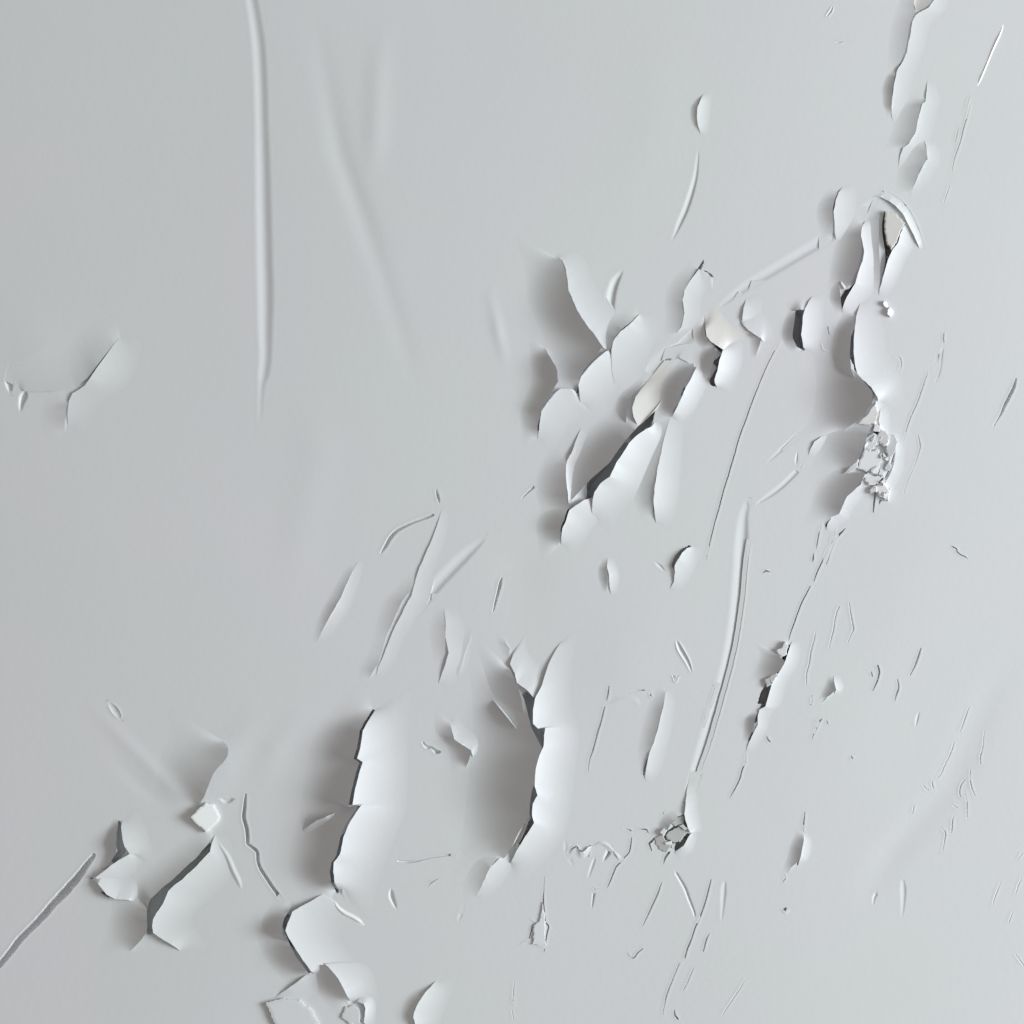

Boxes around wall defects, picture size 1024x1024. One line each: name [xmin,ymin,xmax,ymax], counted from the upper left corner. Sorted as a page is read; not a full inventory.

peeling [516,0,949,559]
peeling [0,794,237,972]
peeling [255,509,624,1024]
peeling [657,771,703,858]
peeling [742,639,801,763]
crack [779,809,812,885]